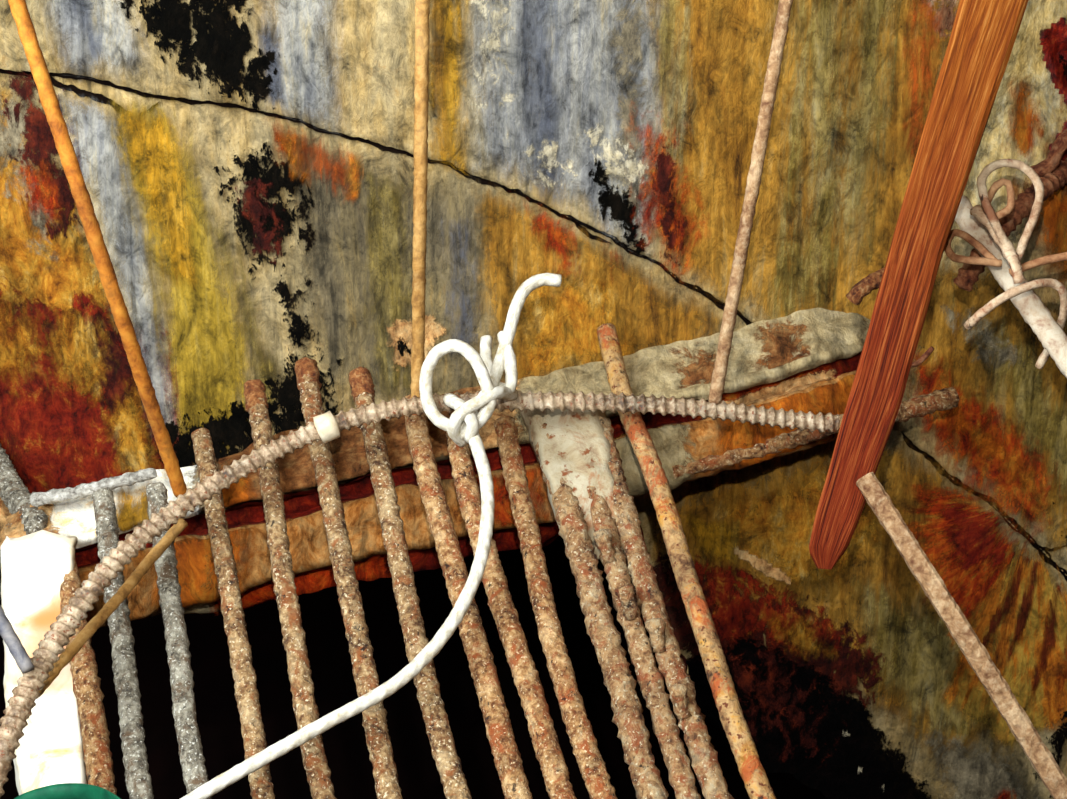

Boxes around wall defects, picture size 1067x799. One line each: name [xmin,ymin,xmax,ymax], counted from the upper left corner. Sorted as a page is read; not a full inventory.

corrosion [0,71,164,493]
leakage [50,0,334,130]
spalling [0,357,481,799]
leakage [213,129,489,436]
crack [0,69,752,325]
spalling [386,315,446,371]
leakage [470,0,664,255]
spalling [458,323,844,799]
corrosion [638,0,960,323]
corrosion [641,412,1017,751]
corrosion [875,267,1067,730]
crack [902,433,1067,581]